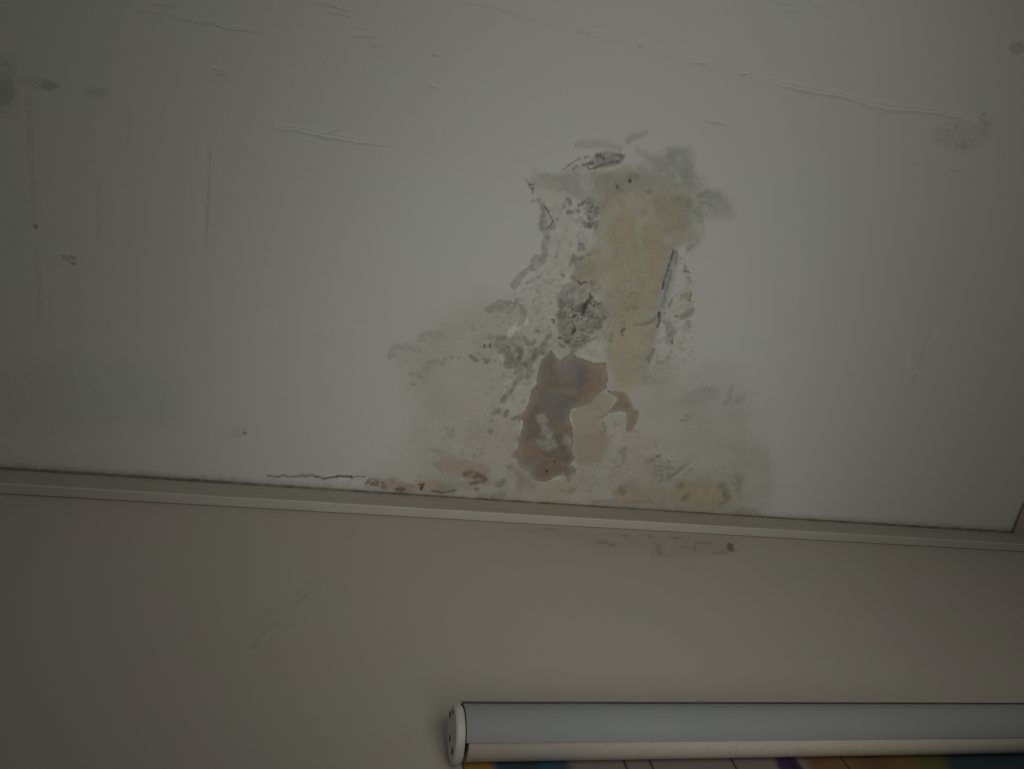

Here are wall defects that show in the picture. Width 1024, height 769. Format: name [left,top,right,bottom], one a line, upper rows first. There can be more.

leakage [511,153,693,391]
crack [270,472,359,480]
spalling [513,350,639,484]